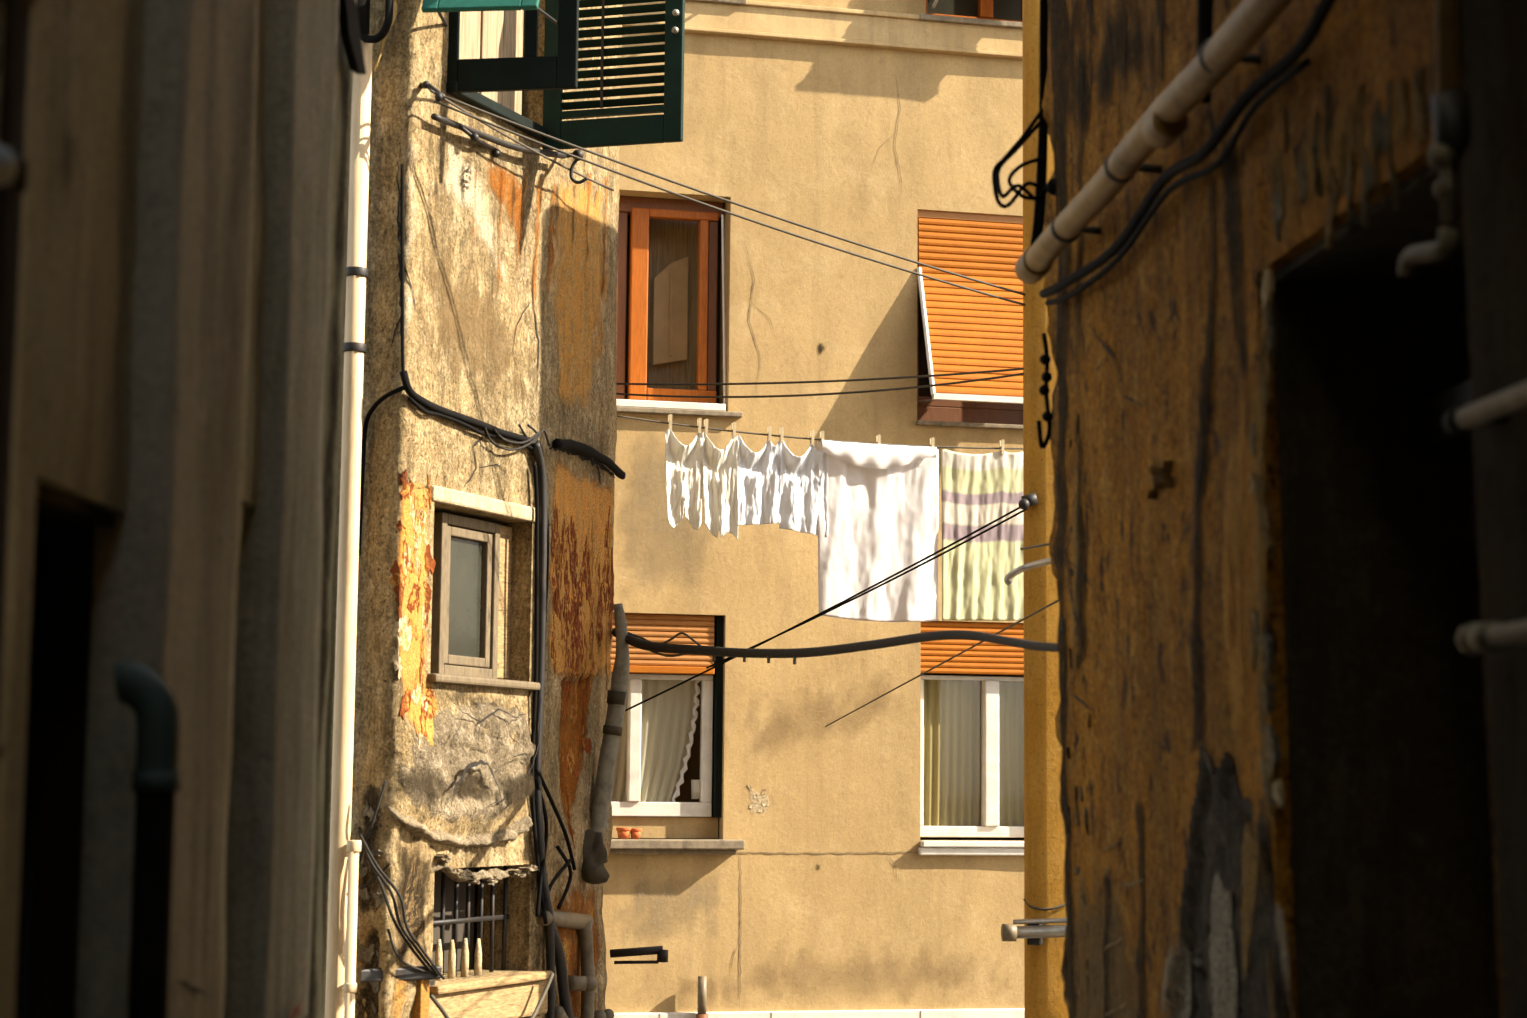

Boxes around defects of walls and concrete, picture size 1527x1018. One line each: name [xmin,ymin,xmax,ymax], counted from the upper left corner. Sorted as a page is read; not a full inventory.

damp [1048,0,1164,216]
rust [489,168,608,404]
crack [746,247,776,391]
damp [1191,139,1248,750]
peeling [389,469,438,749]
peeling [549,462,614,849]
damp [1053,233,1145,1018]
spalling [1161,267,1289,1018]
spalling [430,854,538,885]